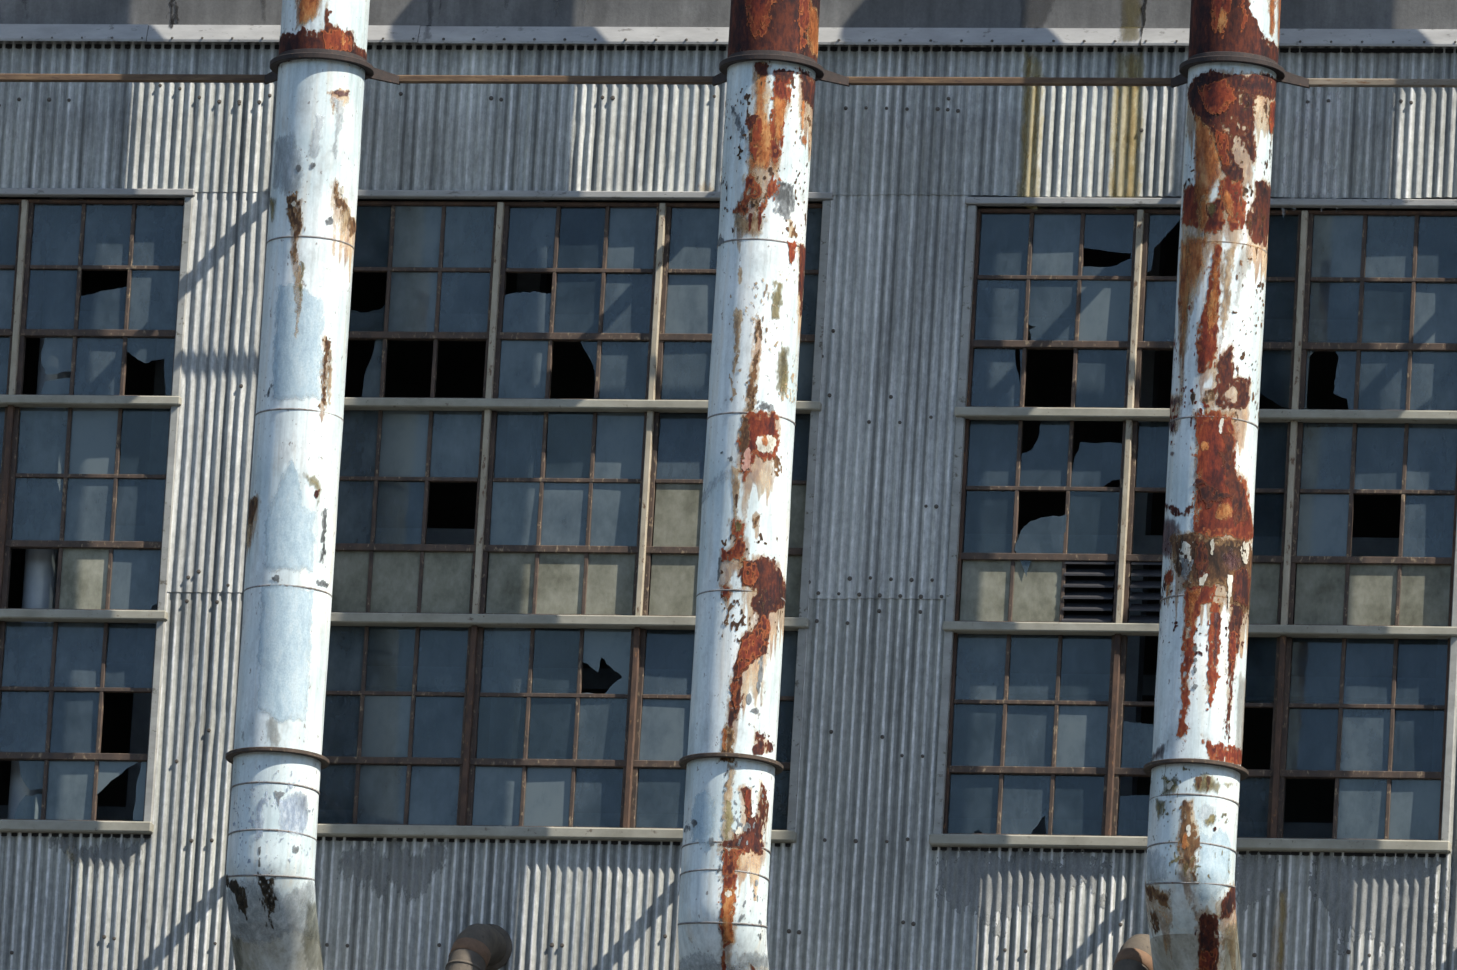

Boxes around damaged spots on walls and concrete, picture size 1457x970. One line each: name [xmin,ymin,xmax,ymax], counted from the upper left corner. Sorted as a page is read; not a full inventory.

rust [279,0,367,69]
rust [727,0,820,245]
rust [787,219,806,334]
rust [1169,0,1281,544]
rust [226,872,280,929]
rust [1145,883,1170,951]
rust [1194,882,1239,970]